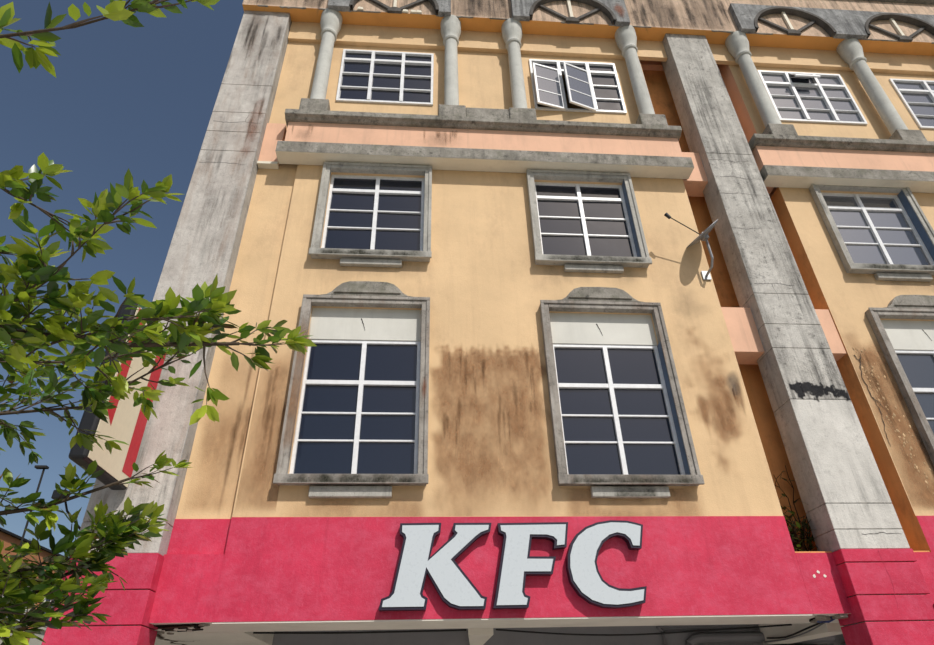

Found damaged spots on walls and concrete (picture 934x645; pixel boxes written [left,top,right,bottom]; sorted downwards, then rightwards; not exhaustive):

water stain [435,348,544,487]
water stain [702,377,743,437]
peeling [789,381,850,401]
crack [854,350,891,446]